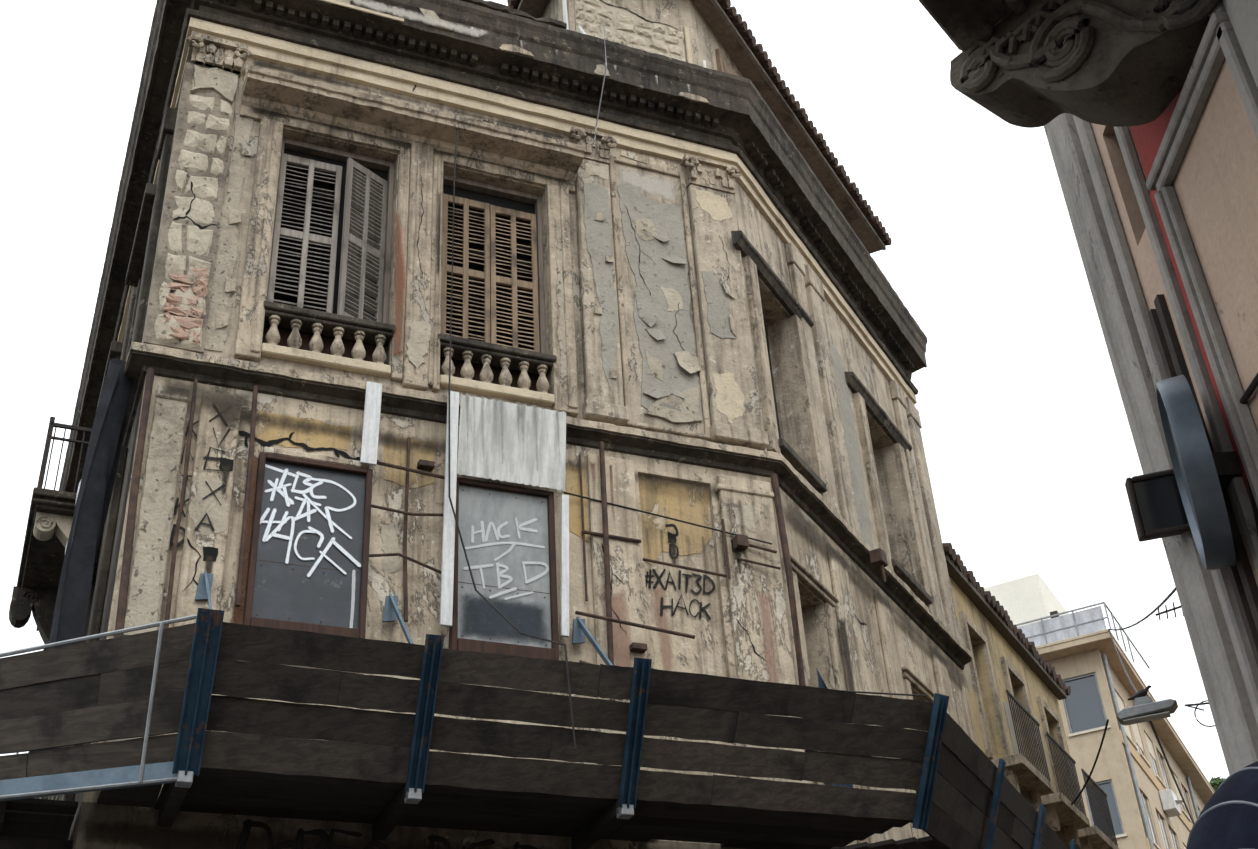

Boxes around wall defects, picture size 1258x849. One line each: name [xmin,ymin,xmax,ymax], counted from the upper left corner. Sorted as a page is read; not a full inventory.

flaking render [163,65,253,352]
flaking render [620,150,678,171]
peeling [583,163,745,423]
crack [239,431,379,461]